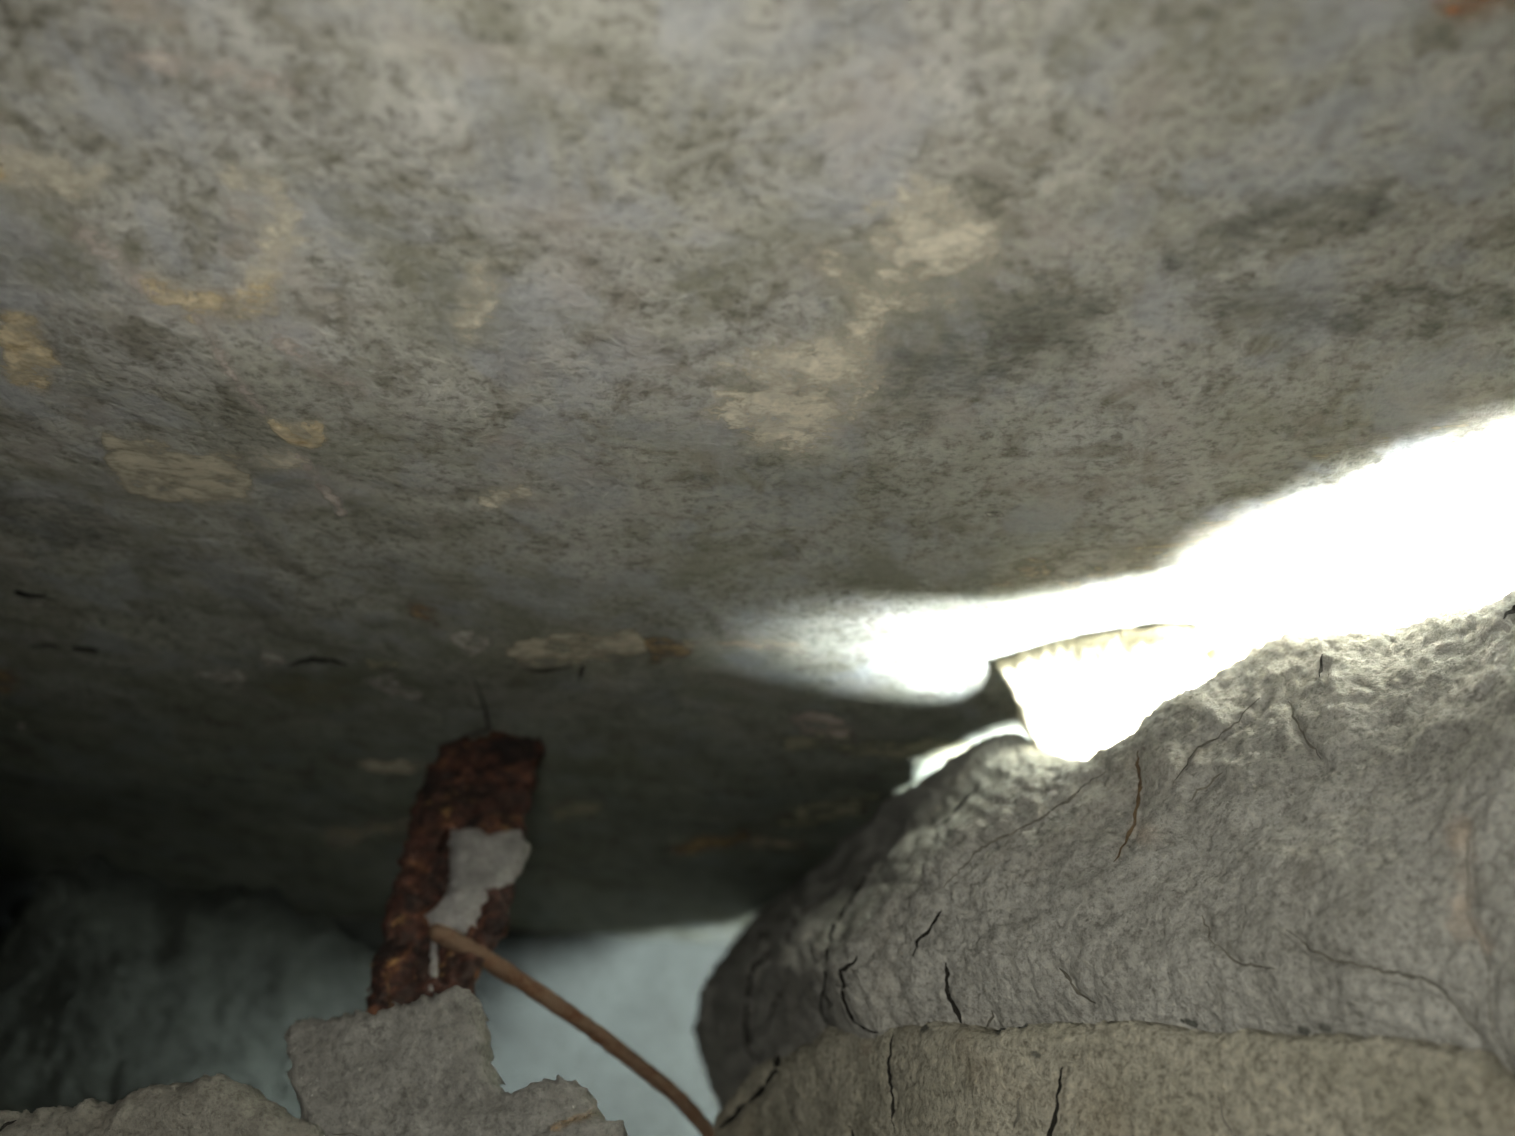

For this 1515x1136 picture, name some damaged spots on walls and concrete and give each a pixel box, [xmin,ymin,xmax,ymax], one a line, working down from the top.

crack [1316,654,1324,677]
crack [912,698,1321,1027]
corrosion [445,950,480,988]
crack [1286,823,1515,1072]
crack [1013,1067,1063,1136]